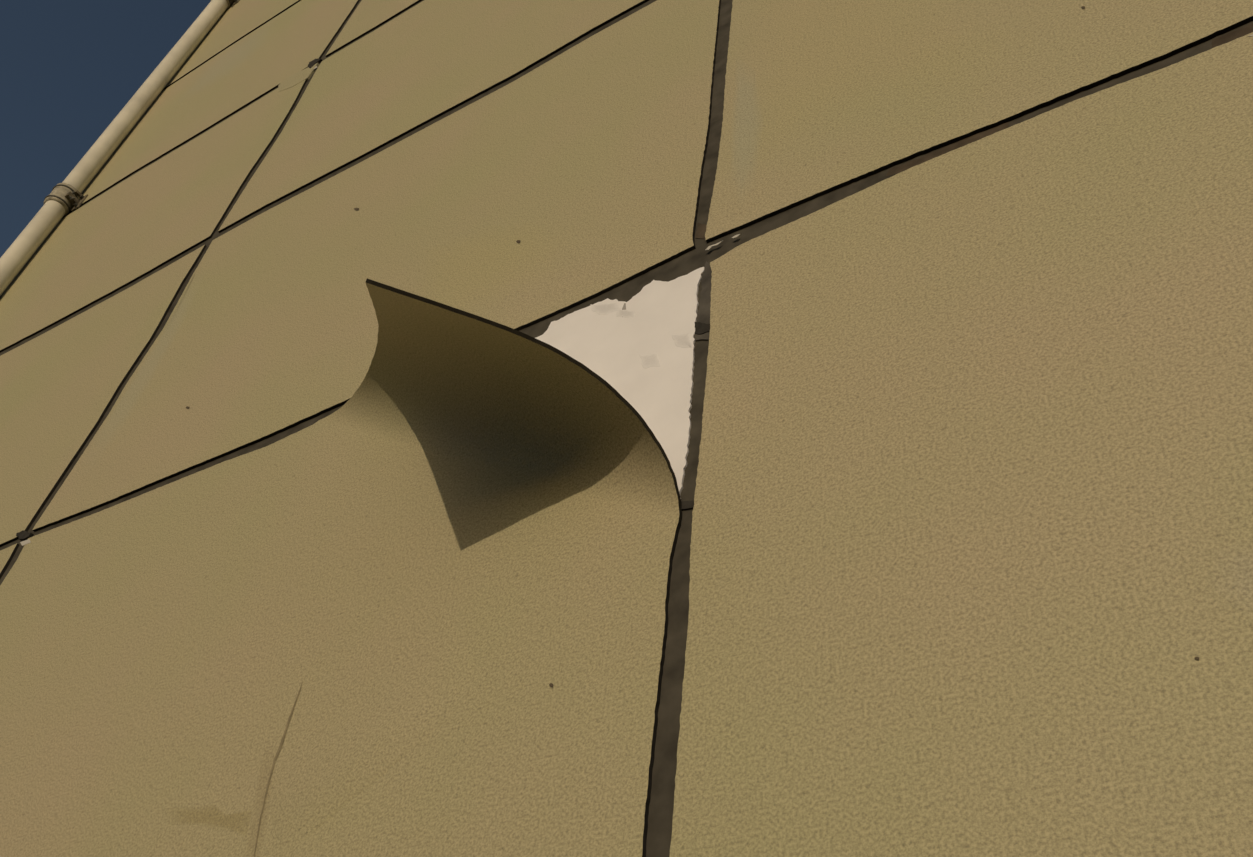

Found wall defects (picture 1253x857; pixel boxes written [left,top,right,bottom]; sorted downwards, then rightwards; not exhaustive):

peeling [319,279,682,524]
crack [254,683,302,855]